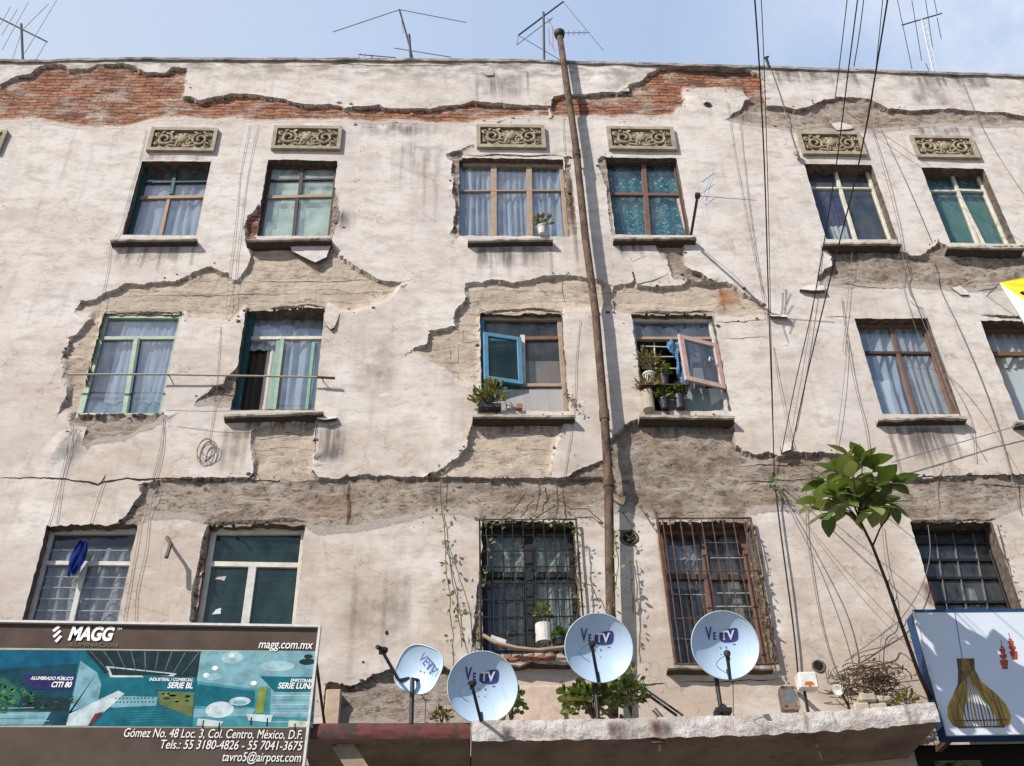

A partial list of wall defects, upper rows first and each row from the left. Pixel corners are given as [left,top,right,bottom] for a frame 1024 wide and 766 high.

spalling [0,63,1024,134]
spalling [57,190,404,451]
spalling [405,246,788,403]
crack [2,474,220,494]
spalling [120,411,848,663]
spalling [317,666,472,727]